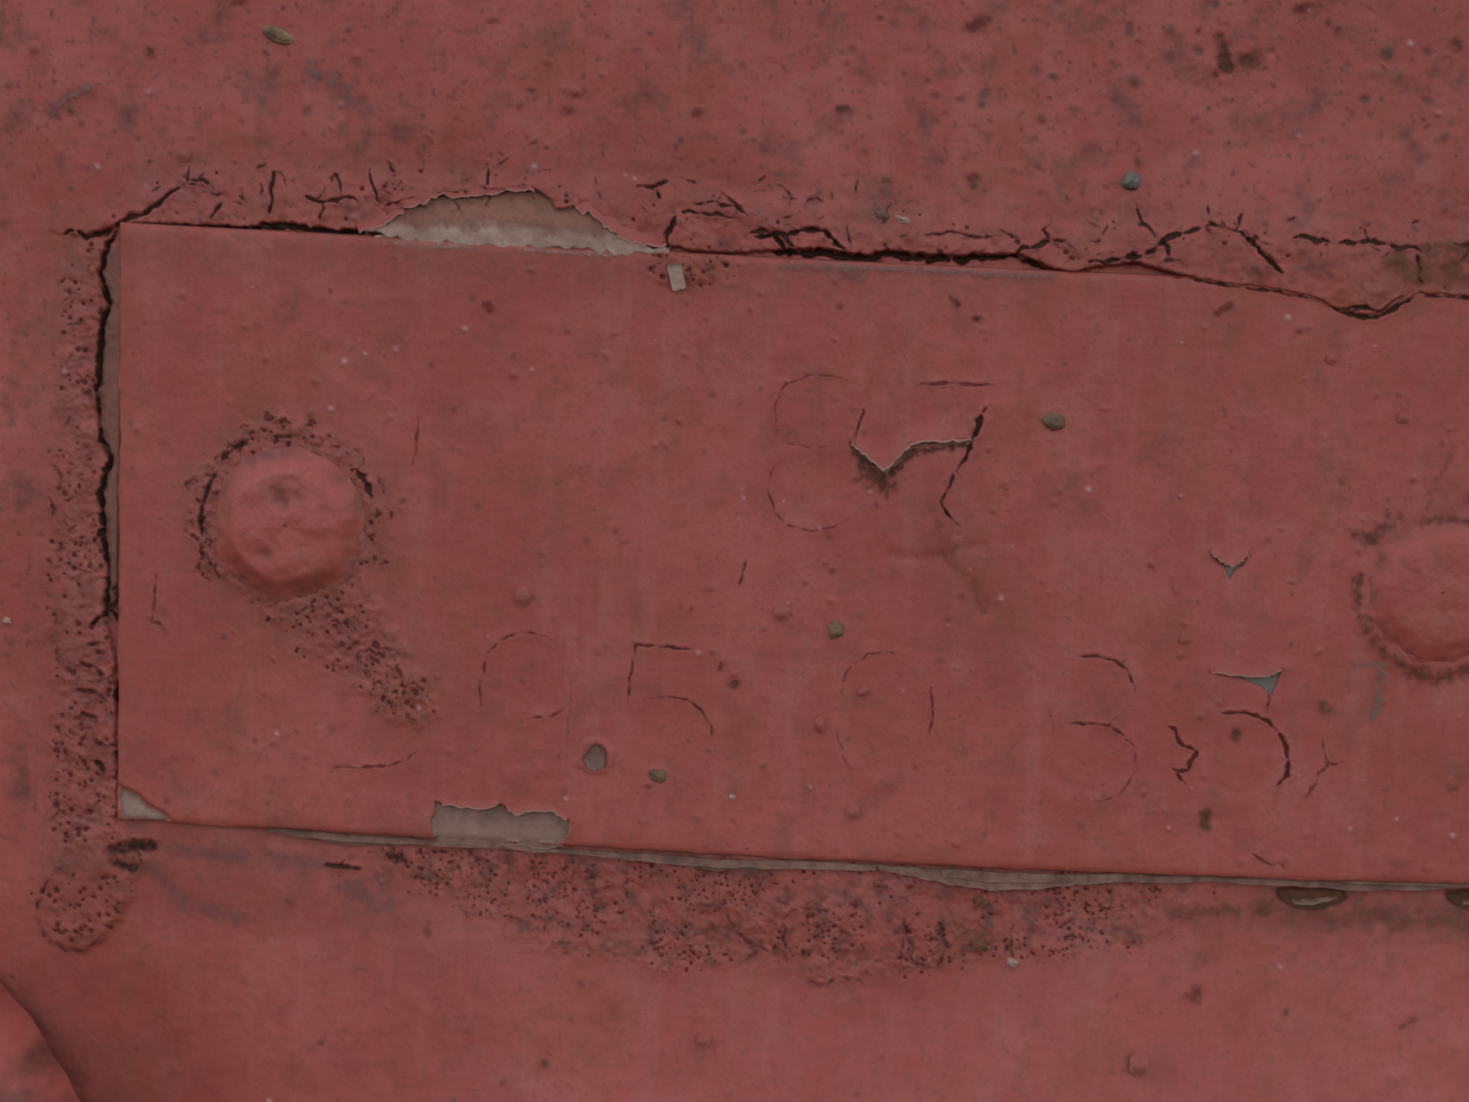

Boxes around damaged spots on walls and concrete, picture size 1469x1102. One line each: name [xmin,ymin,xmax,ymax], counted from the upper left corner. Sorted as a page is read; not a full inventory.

crack [457,160,505,205]
peeling [356,181,686,291]
crack [644,177,1469,320]
crack [50,164,423,818]
crack [921,381,987,517]
peeling [265,799,1469,910]